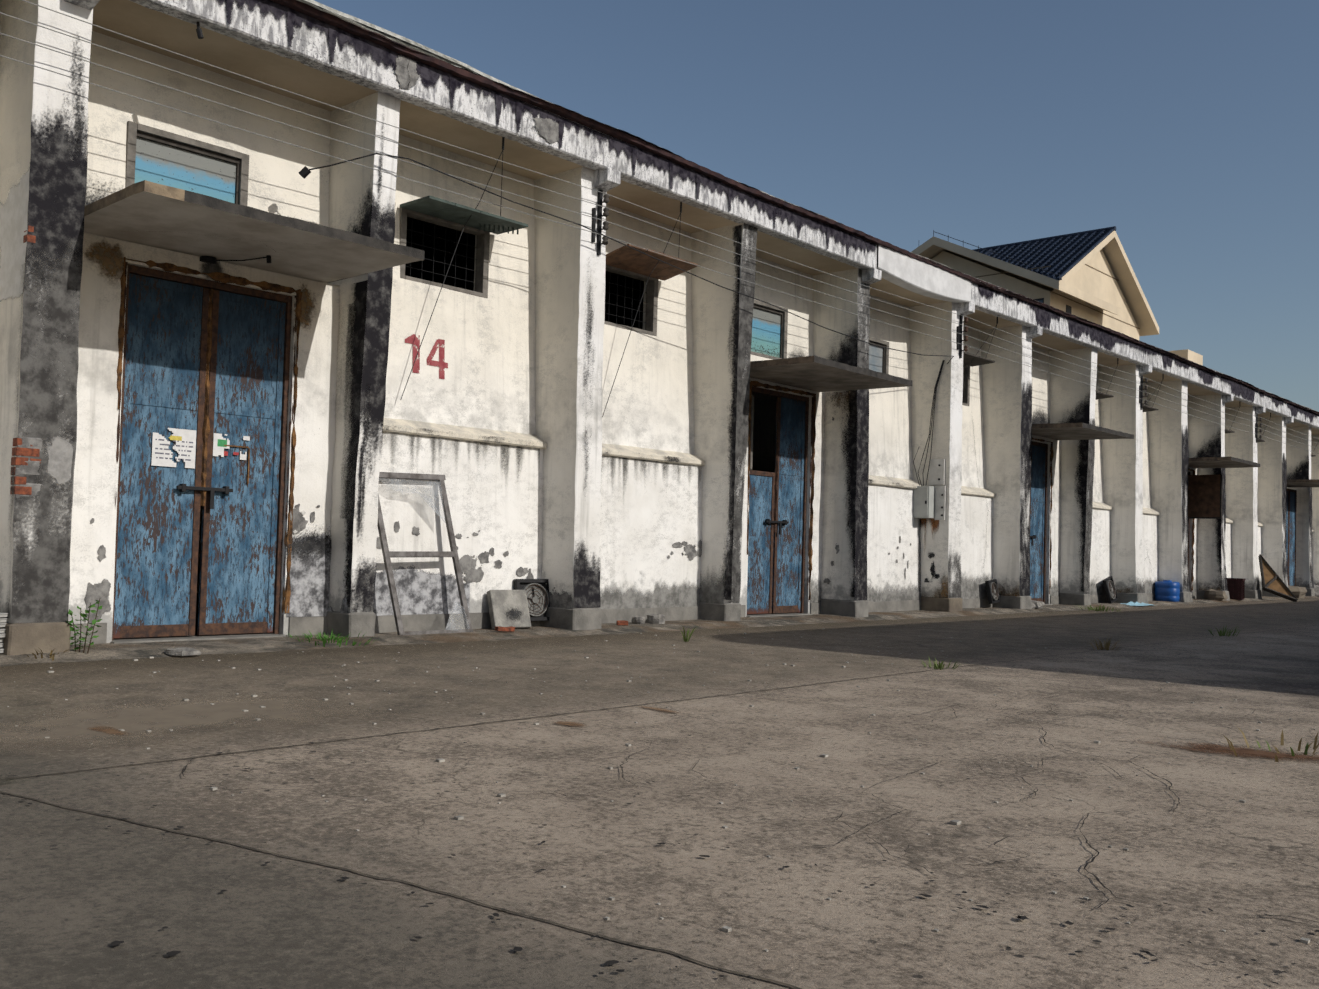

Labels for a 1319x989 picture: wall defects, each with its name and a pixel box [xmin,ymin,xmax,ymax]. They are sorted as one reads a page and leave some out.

leakage [6,42,120,623]
leakage [217,0,876,612]
flaking render [10,432,73,498]
leakage [827,383,1156,602]
crack [554,678,1319,910]